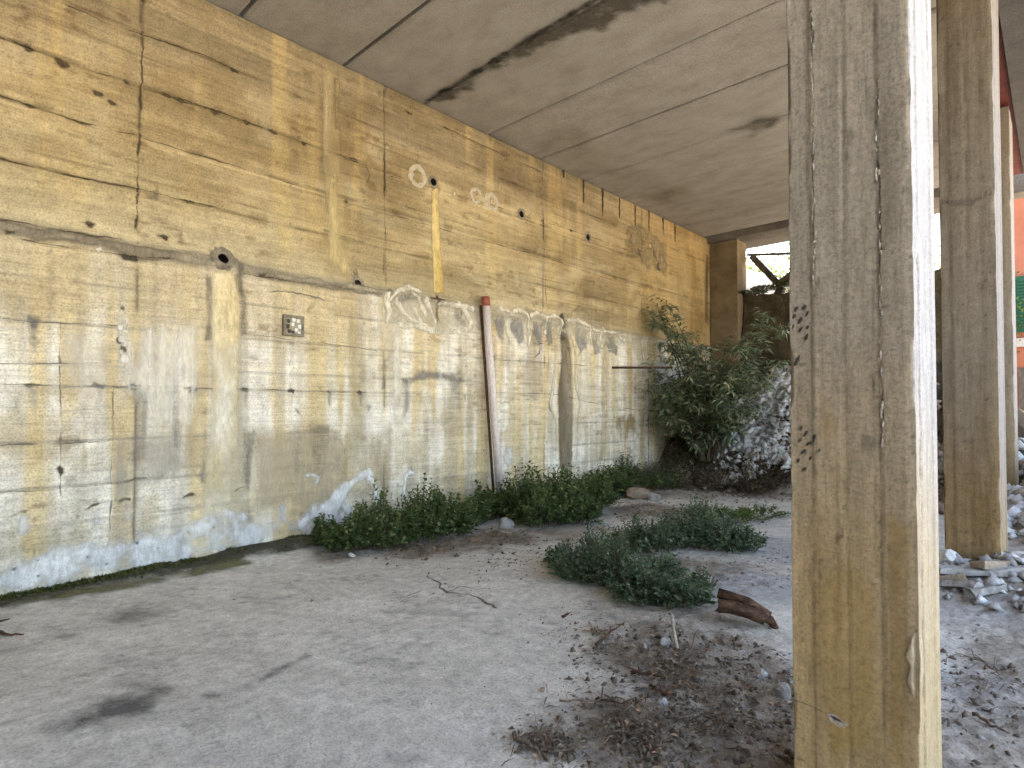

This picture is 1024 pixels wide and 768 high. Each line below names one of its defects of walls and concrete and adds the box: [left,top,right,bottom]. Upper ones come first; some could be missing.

crack [0,37,70,68]
leakage [428,0,666,101]
crack [63,30,277,228]
leakage [329,178,353,274]
crack [302,142,630,277]
leakage [0,262,382,607]
crack [408,572,496,608]
spalling [905,634,923,695]